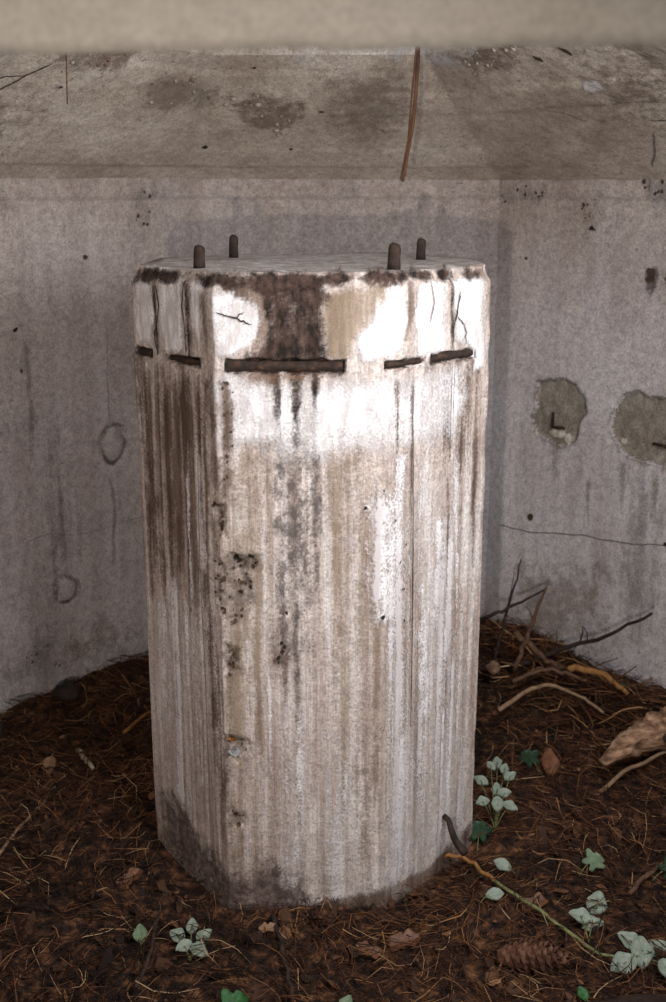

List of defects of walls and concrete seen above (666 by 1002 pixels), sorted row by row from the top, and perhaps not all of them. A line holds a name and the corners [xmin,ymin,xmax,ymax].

crack [648,120,666,192]
rust [225,282,385,375]
leakage [134,274,485,911]